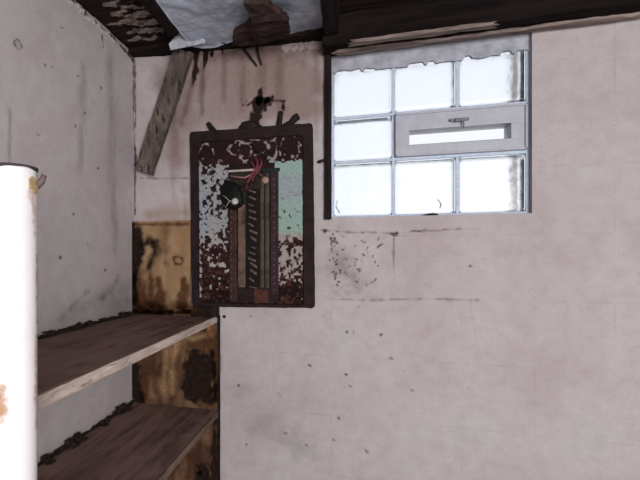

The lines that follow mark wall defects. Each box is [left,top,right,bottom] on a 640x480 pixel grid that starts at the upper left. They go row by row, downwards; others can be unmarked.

peeling [69,0,164,44]
damp [190,50,315,127]